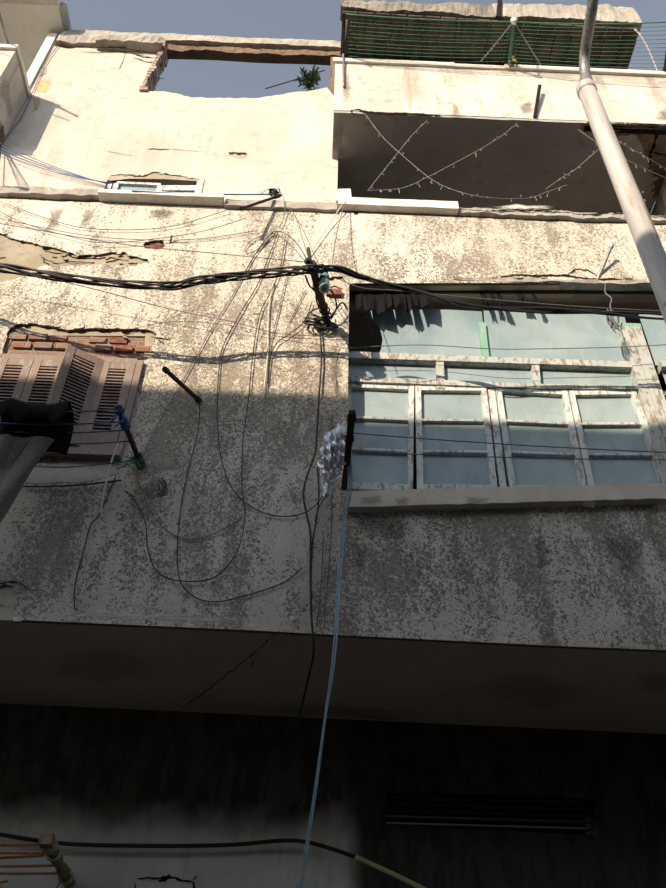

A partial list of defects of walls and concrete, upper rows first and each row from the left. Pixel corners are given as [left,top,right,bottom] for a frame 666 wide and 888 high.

spalling [95,33,168,92]
flaking render [107,172,205,182]
flaking render [0,233,149,281]
flaking render [144,240,165,249]
flaking render [5,322,153,360]
flaking render [0,584,24,623]